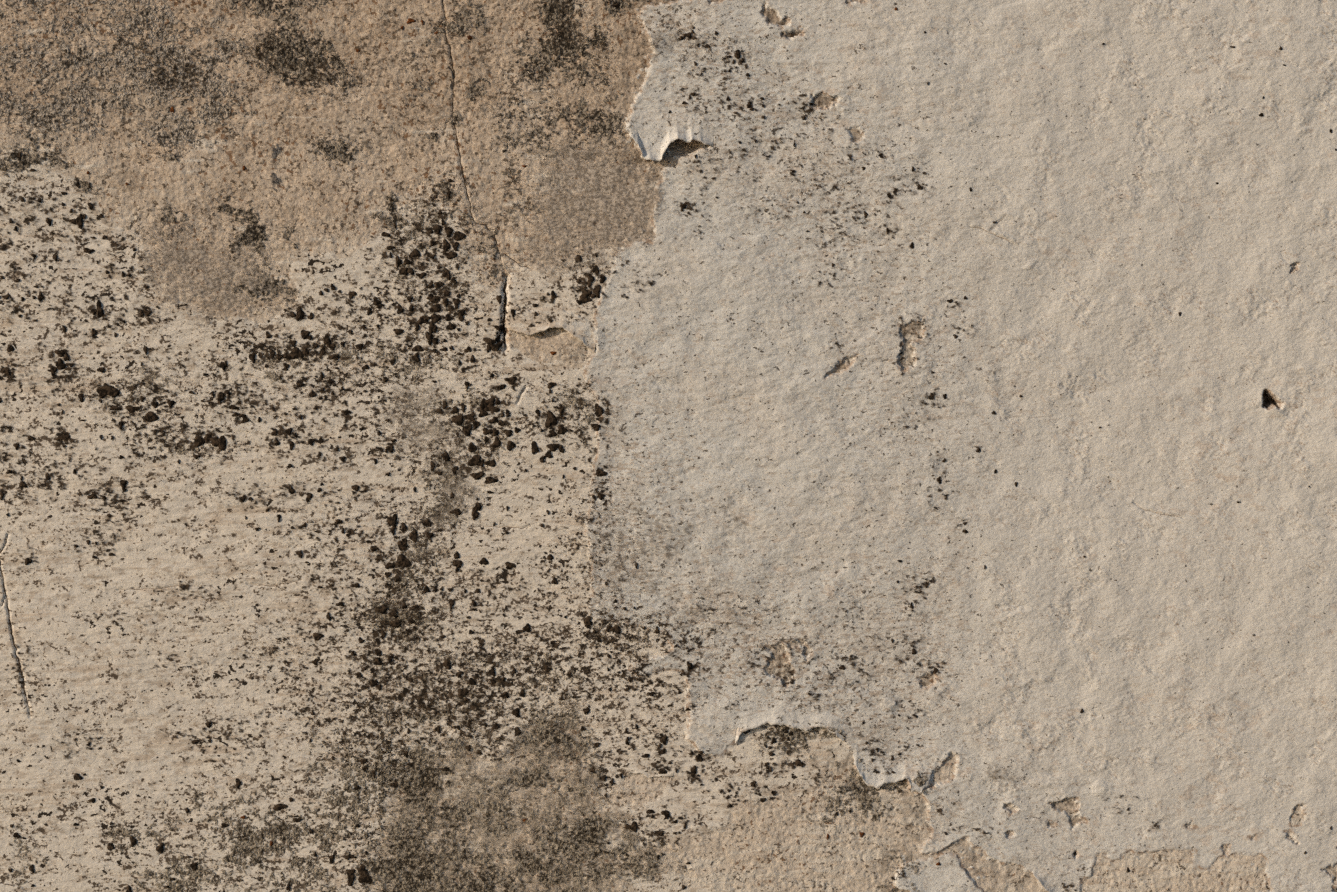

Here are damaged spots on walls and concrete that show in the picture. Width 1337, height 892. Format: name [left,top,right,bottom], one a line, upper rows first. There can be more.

peeling [0,0,713,326]
crack [435,0,530,347]
peeling [505,309,596,366]
leakage [0,0,946,892]
peeling [375,704,1060,892]
peeling [1048,799,1086,827]
peeling [1081,837,1271,892]
peeling [1287,805,1305,842]